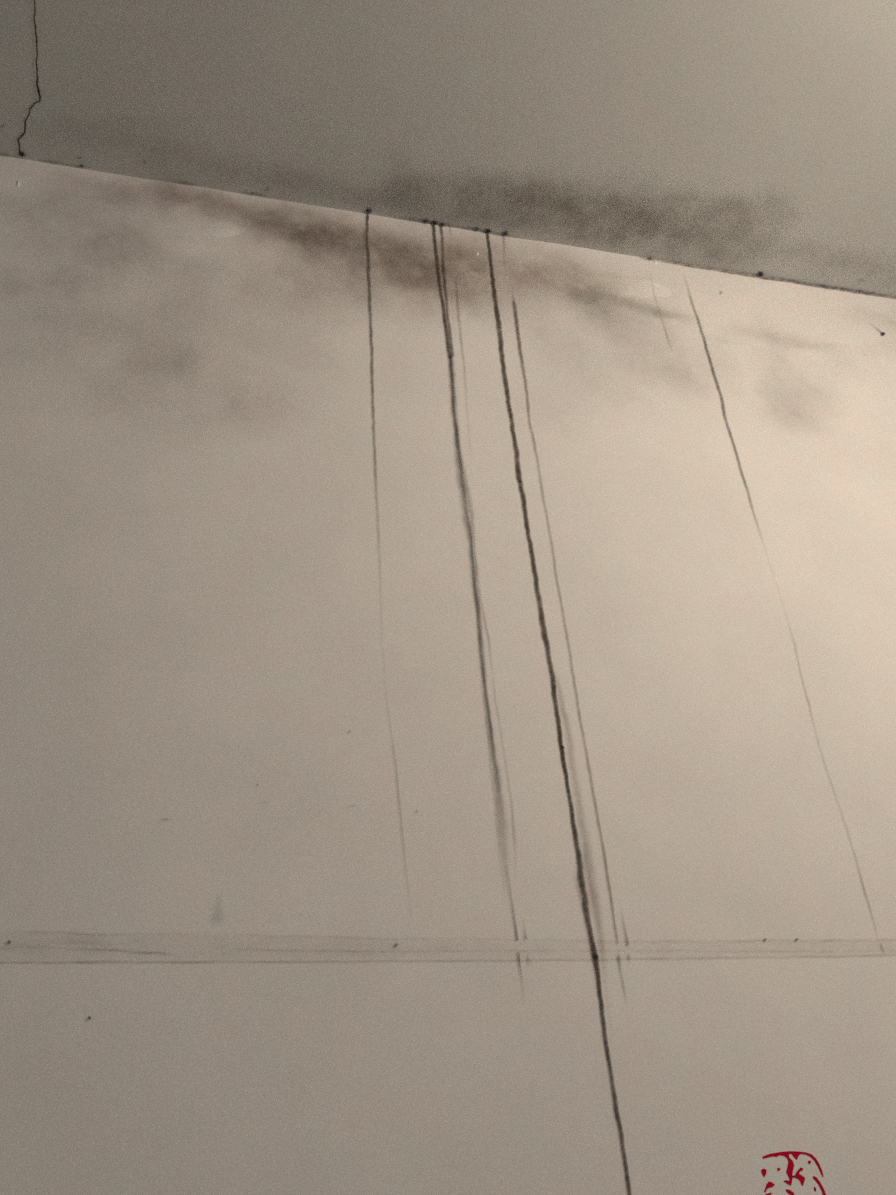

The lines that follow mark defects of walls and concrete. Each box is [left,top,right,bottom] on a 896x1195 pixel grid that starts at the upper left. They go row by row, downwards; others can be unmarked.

crack [17,0,41,156]
water stain [366,209,374,416]
water stain [423,219,459,458]
water stain [474,228,631,1195]